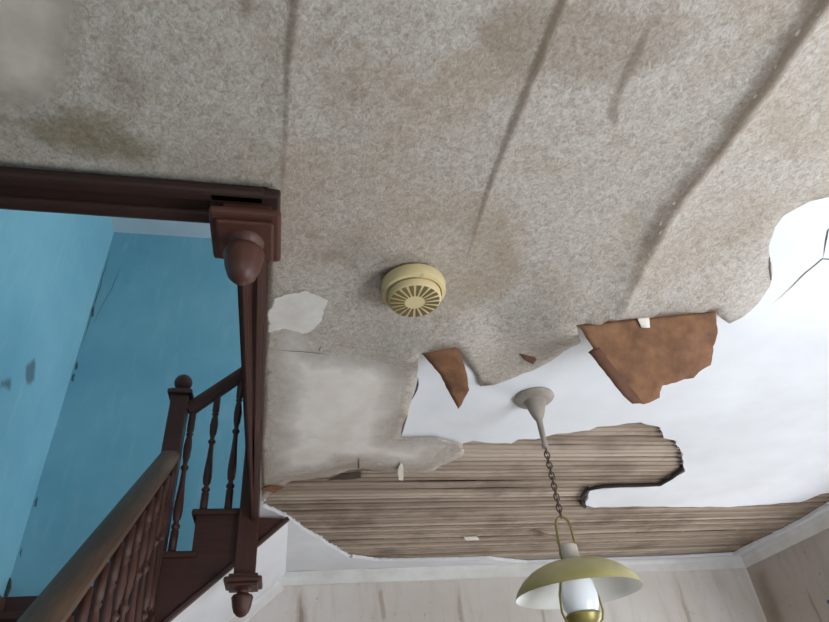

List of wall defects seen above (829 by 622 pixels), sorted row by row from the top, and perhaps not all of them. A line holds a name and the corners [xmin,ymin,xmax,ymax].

crack [769,229,829,303]
flaking render [261,291,829,560]